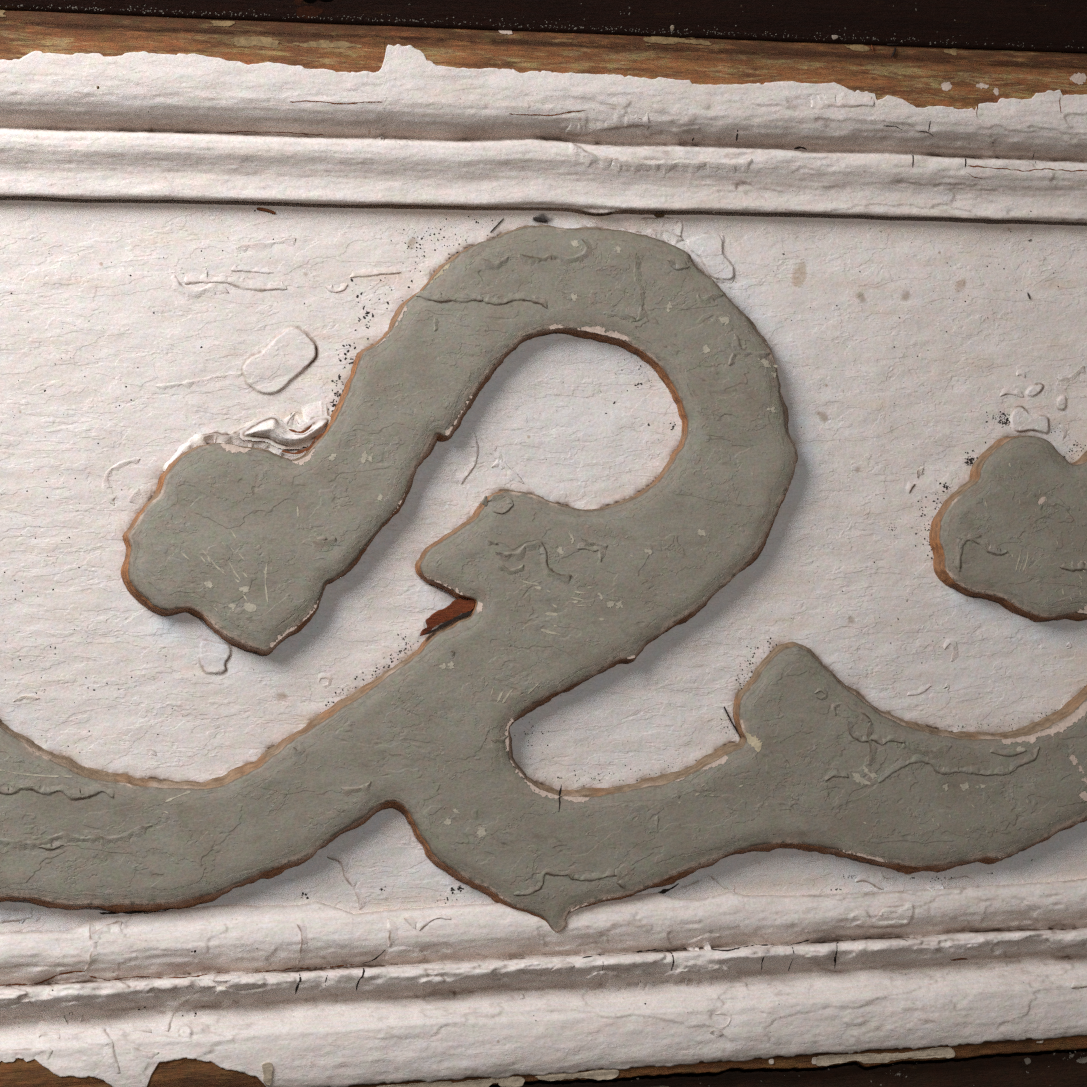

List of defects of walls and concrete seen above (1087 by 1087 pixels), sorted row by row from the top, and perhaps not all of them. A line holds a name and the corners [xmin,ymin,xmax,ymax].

peeling [0,10,384,73]
peeling [422,25,1087,110]
crack [513,865,626,896]
crack [658,883,679,894]
crack [100,908,170,916]
crack [583,938,907,971]
crack [0,971,226,986]
crack [257,950,385,995]
peeling [0,1058,112,1087]
peeling [147,1058,273,1087]
peeling [535,1069,619,1081]